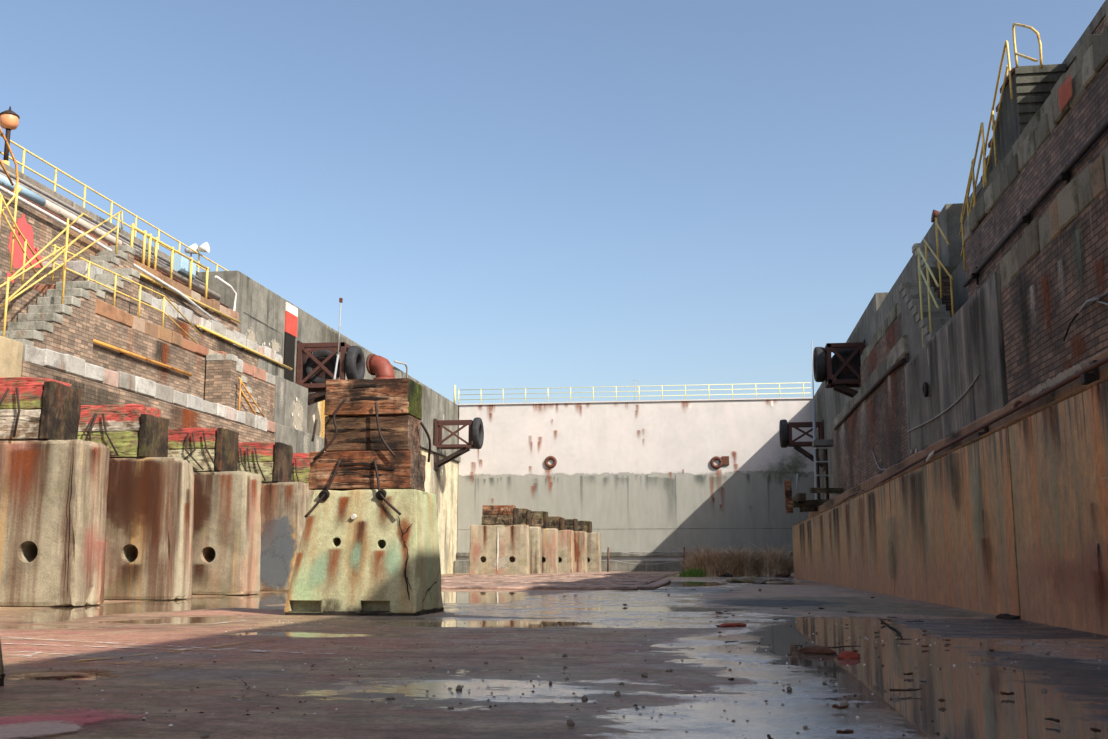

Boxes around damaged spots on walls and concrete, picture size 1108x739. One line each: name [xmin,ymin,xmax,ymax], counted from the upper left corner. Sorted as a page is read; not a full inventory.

corrosion [13,442,50,482]
corrosion [107,459,160,536]
corrosion [175,462,231,534]
corrosion [248,480,292,507]
corrosion [305,516,314,538]
corrosion [398,520,411,555]
corrosion [123,564,140,579]
corrosion [194,564,205,577]
corrosion [328,549,340,574]